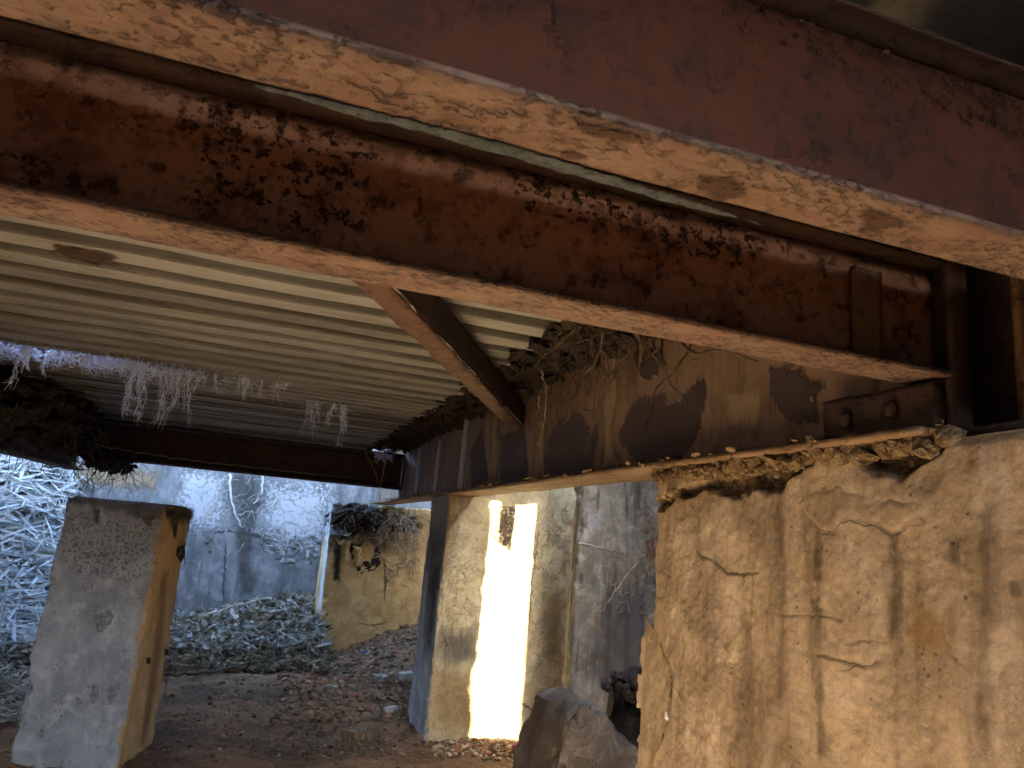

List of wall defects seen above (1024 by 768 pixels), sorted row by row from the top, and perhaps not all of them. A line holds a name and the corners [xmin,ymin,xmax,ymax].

corrosion [181,98,378,240]
corrosion [514,171,767,268]
corrosion [861,210,903,231]
spalling [870,454,930,476]
spalling [356,547,381,574]
crack [696,551,754,587]
crack [819,640,884,671]